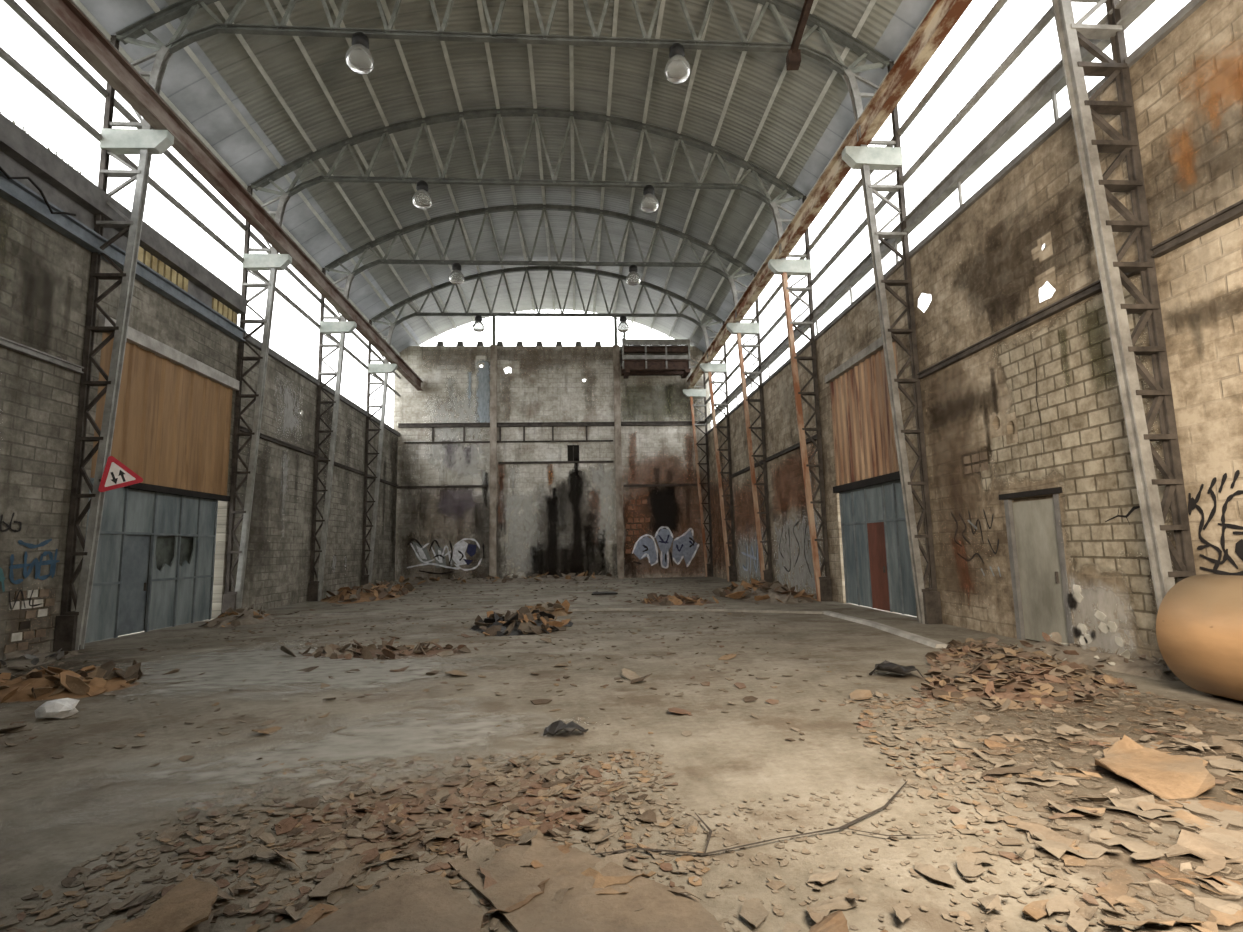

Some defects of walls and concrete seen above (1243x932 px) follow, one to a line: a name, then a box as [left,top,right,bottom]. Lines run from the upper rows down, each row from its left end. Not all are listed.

damp [963,200,1089,322]
rust [625,433,813,577]